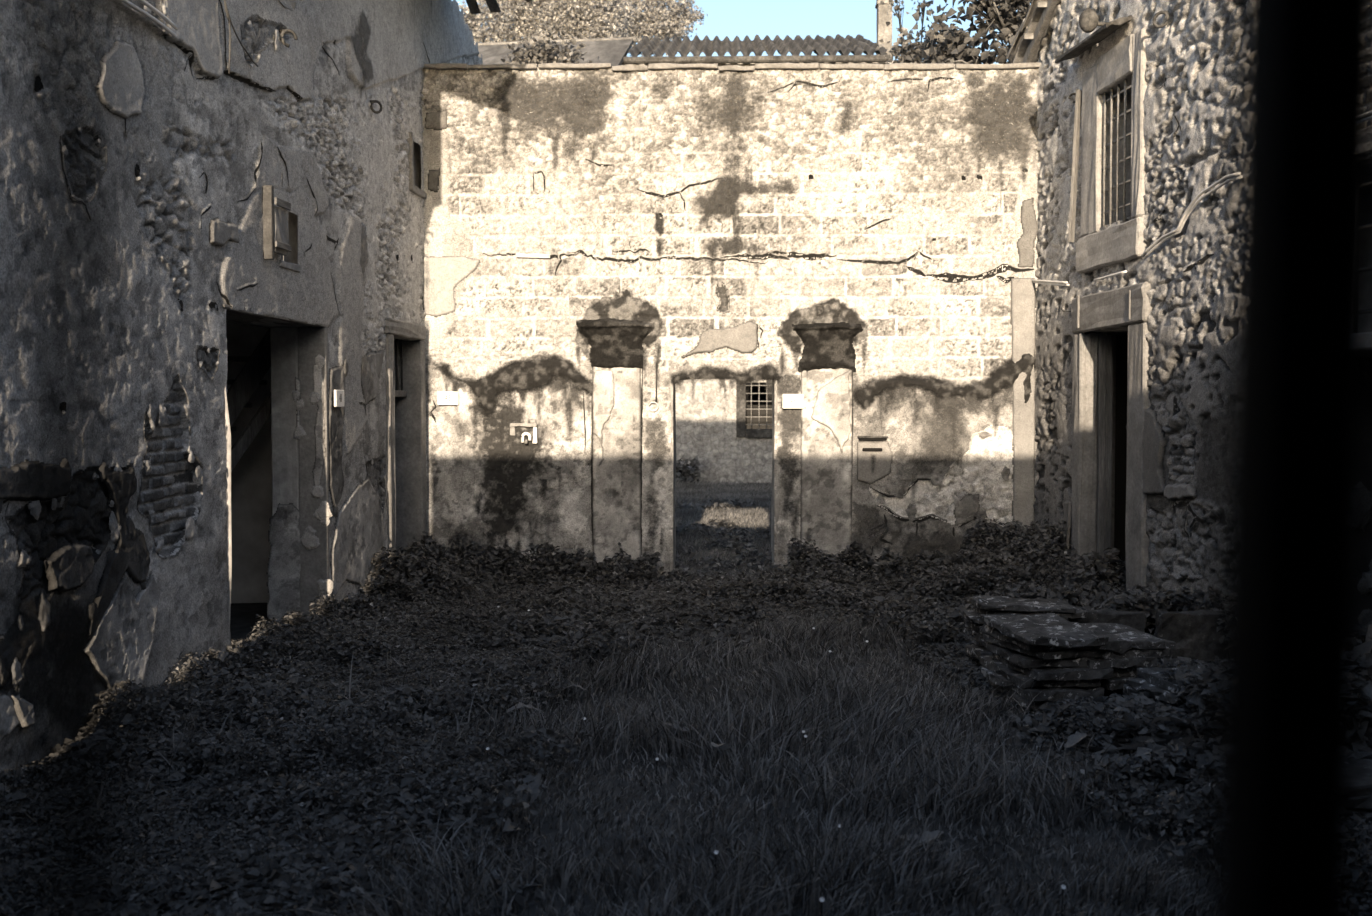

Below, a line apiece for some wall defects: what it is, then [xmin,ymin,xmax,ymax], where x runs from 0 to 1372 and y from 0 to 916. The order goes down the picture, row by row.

water stain [493,76,611,168]
water stain [695,74,793,272]
crack [482,217,1035,284]
water stain [964,73,1039,180]
flaking render [197,345,220,381]
flaking render [109,374,203,603]
water stain [449,378,583,558]
flaking render [0,459,36,729]